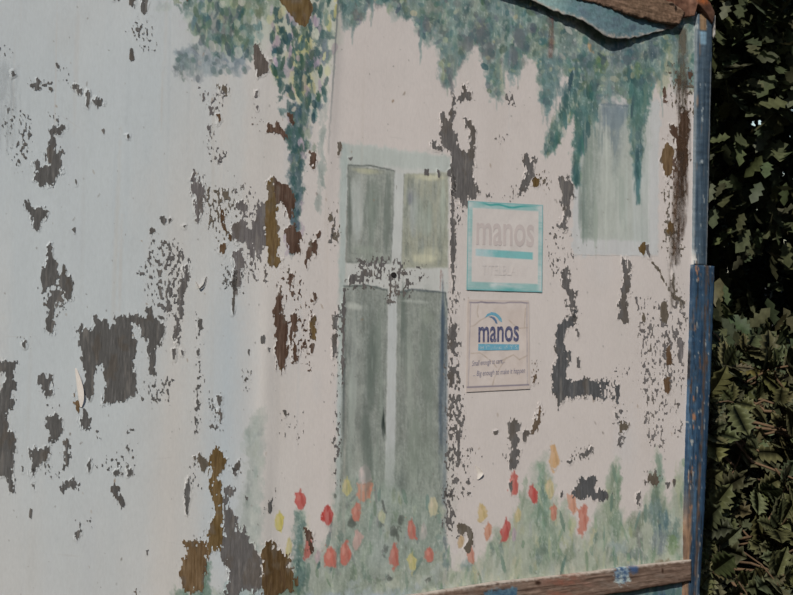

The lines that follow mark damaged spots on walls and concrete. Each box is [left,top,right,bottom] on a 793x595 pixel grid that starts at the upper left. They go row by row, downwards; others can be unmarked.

peeling [125,22,157,61]
peeling [1,105,69,189]
peeling [22,199,51,232]
peeling [37,241,75,336]
peeling [70,169,341,439]
peeling [330,256,424,397]
peeling [424,82,631,556]
peeling [615,254,688,452]
peeling [0,354,80,495]
peeling [84,445,137,509]
peeling [175,445,298,595]
peeling [633,469,676,509]